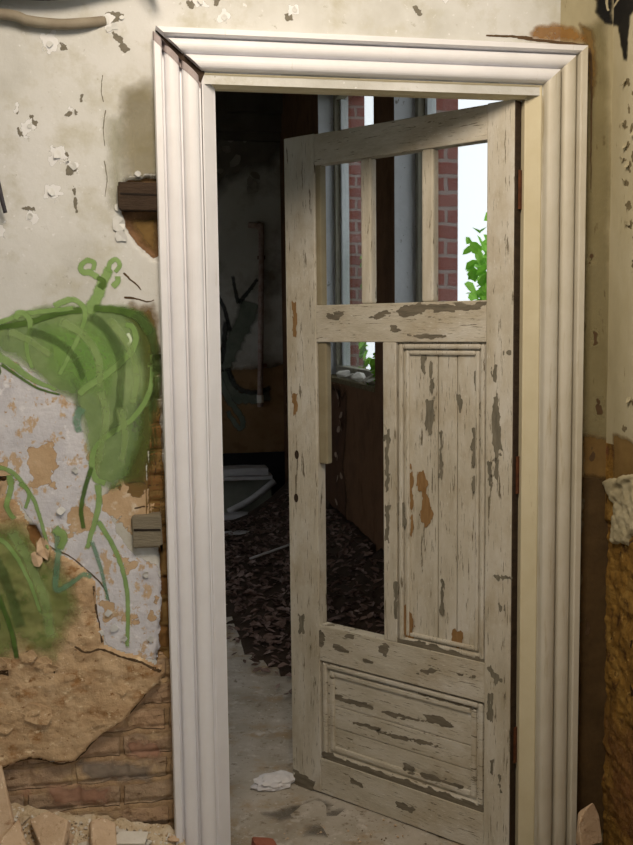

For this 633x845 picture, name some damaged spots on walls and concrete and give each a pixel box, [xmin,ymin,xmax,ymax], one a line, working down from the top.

spalling [126,171,156,183]
peeling [619,104,633,187]
spalling [113,204,158,258]
spalling [602,474,633,546]
peeling [0,362,175,830]